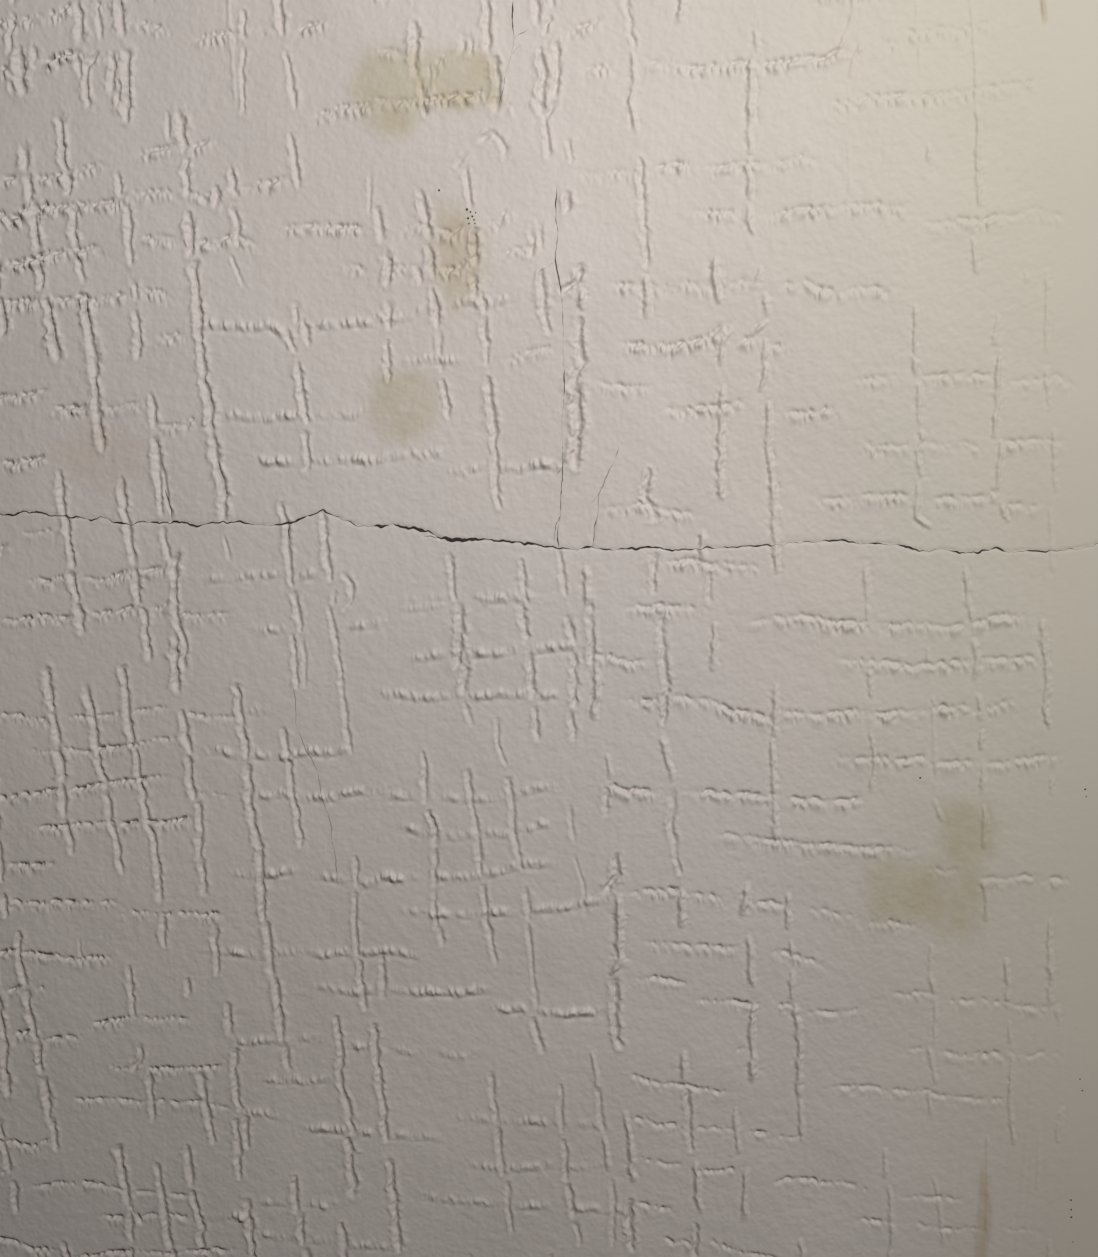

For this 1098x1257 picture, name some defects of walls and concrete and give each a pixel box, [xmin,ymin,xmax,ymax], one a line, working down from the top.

crack [539,192,563,320]
crack [1,357,1097,554]